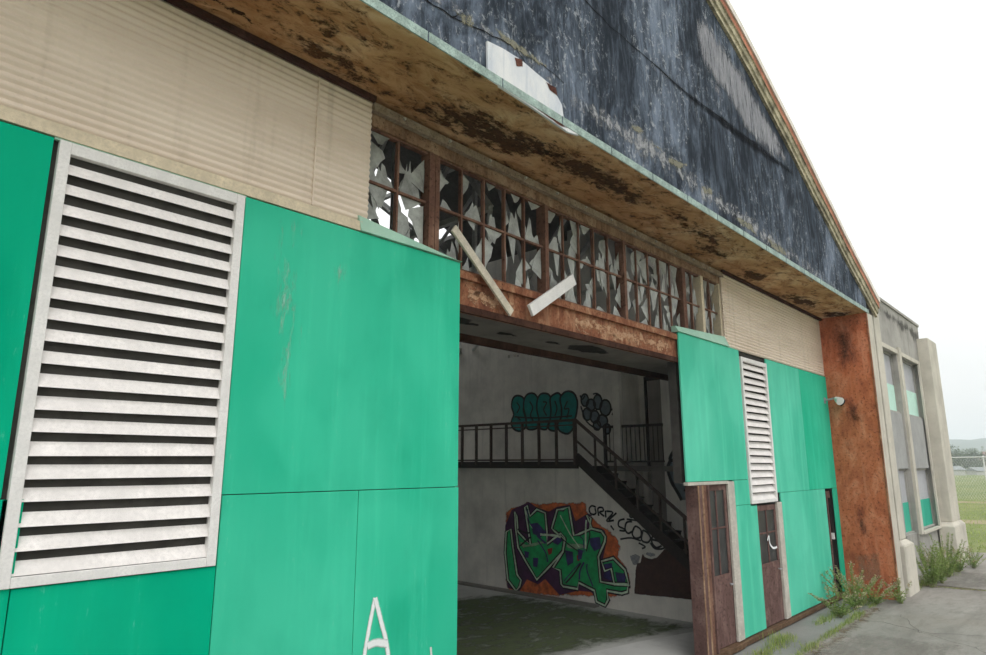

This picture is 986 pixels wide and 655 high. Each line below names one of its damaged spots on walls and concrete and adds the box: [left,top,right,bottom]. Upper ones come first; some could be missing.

leakage [213,0,253,24]
leakage [278,17,391,96]
crack [426,0,564,83]
leakage [669,78,790,172]
leakage [406,102,654,208]
leakage [667,207,727,259]
rust [468,287,514,310]
leakage [741,269,767,282]
leakage [786,294,847,317]
rust [575,317,669,351]